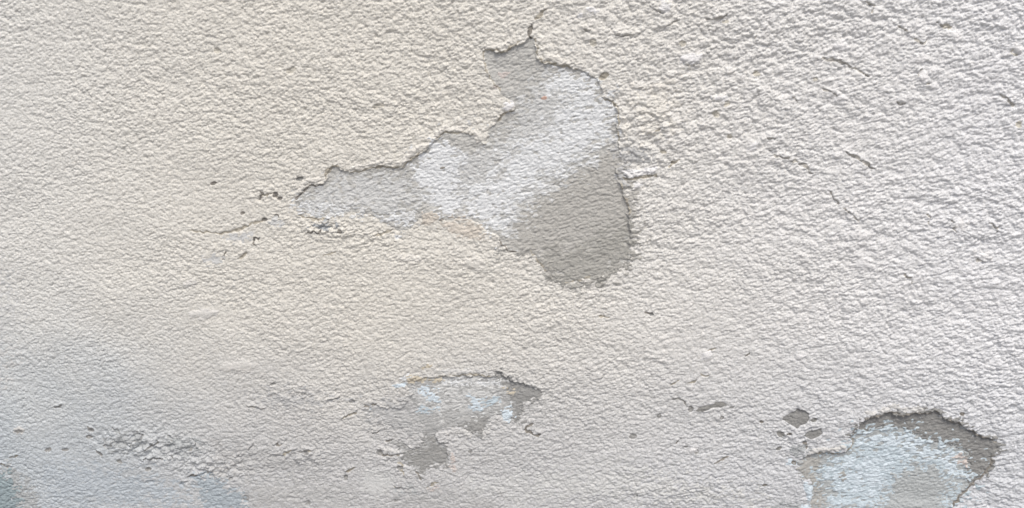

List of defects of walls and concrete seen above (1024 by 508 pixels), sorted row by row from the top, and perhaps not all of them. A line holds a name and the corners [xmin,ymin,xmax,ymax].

spalling [262,38,662,297]
spalling [376,366,547,480]
spalling [776,403,1007,508]